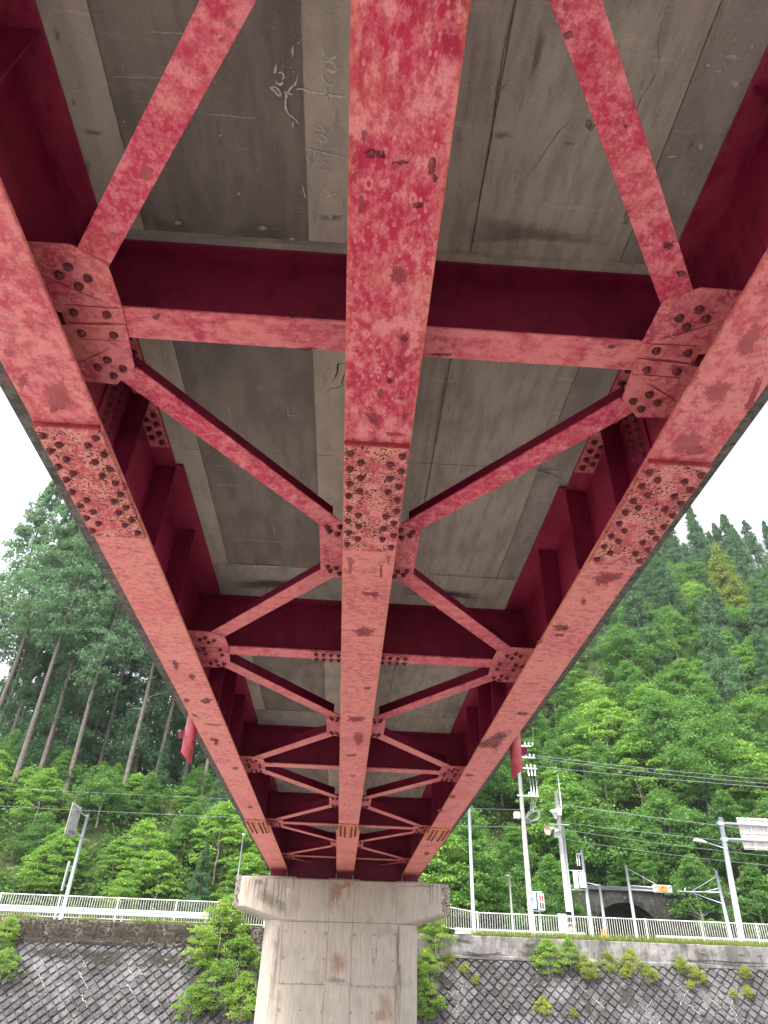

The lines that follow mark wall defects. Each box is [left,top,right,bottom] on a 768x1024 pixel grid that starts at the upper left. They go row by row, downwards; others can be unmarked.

crack [473,3,516,244]
peeling [388,263,408,287]